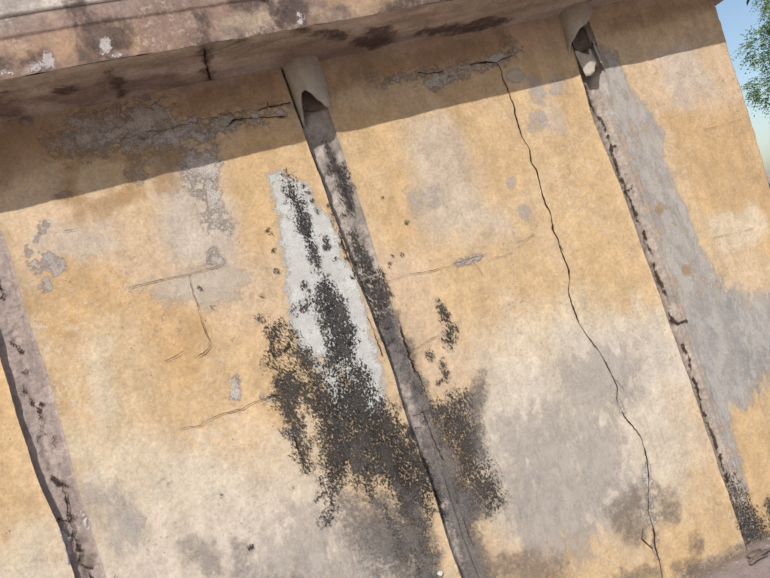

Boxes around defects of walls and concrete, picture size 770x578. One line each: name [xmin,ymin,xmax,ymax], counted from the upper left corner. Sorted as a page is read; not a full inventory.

leakage [23,50,56,74]
leakage [64,0,130,62]
peeling [24,220,66,293]
peeling [40,94,295,235]
peeling [136,245,250,309]
peeling [266,170,386,419]
leakage [242,136,647,578]
crack [469,52,663,578]
crack [584,84,687,325]
leakage [596,46,770,578]
crack [680,343,729,484]
crack [50,475,93,578]